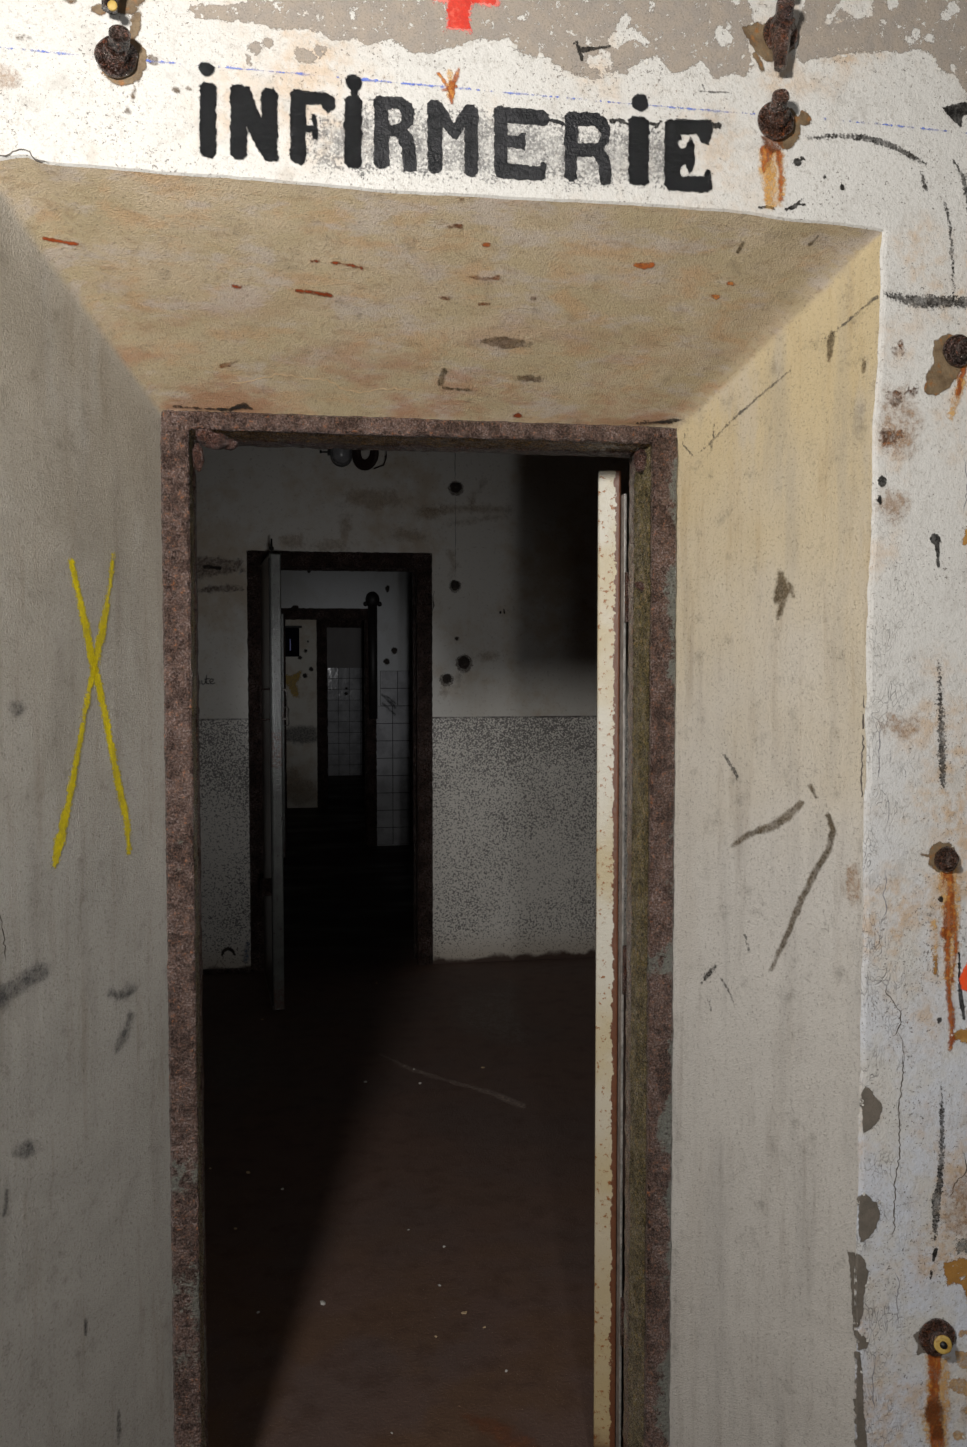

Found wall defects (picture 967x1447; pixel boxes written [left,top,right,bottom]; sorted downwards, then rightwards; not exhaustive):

peeling [188,0,967,92]
rust [759,136,785,207]
rust [949,367,966,416]
rust [931,867,960,1051]
rust [923,1355,950,1447]